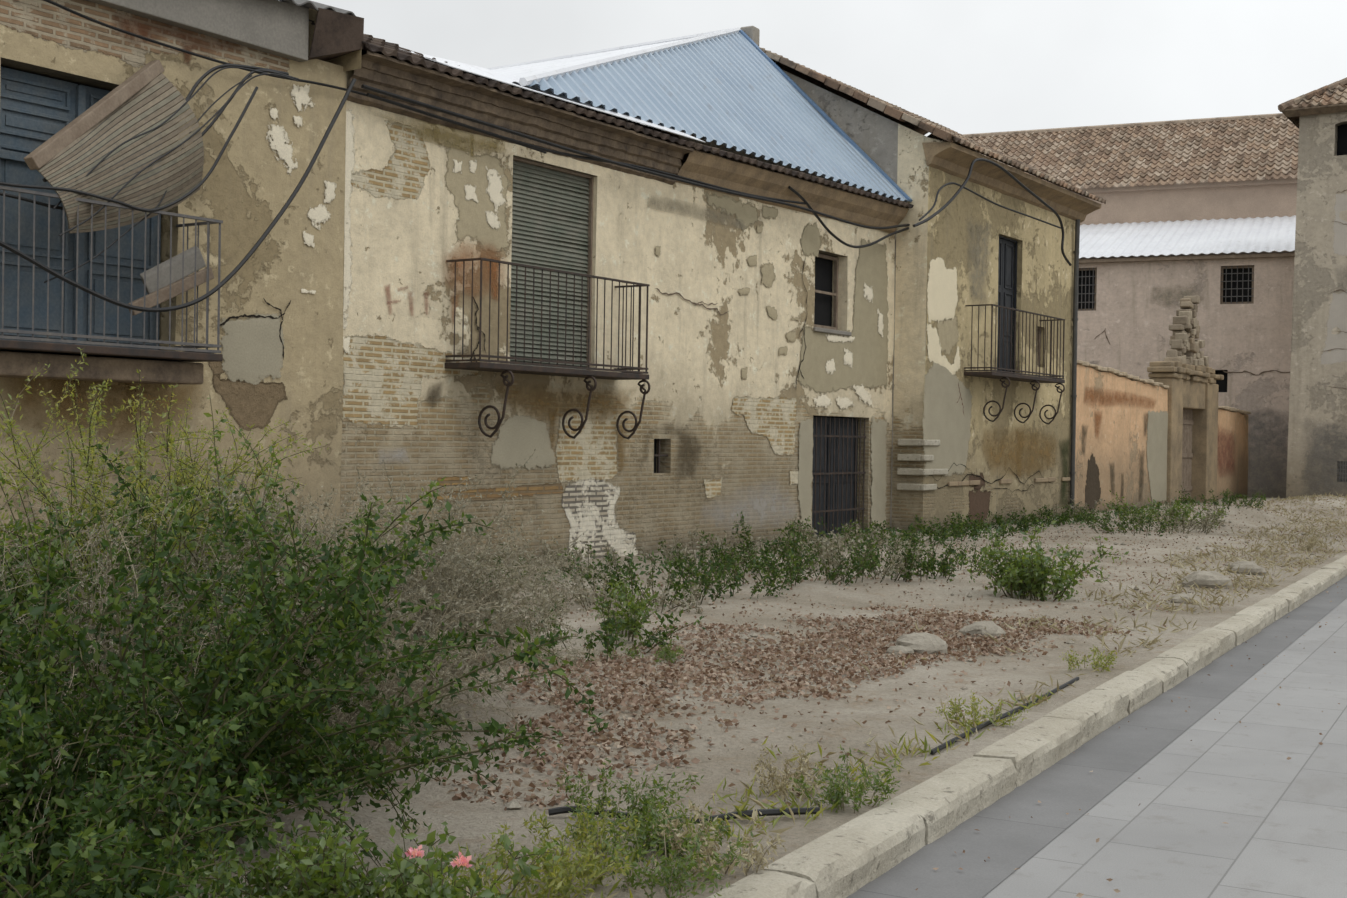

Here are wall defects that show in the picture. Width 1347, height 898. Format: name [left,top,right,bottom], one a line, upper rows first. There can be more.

flaking render [0,0,315,175]
peeling [303,180,337,248]
peeling [444,142,511,252]
crack [220,298,291,360]
crack [656,288,729,316]
peeling [926,324,961,375]
spalling [208,353,288,431]
peeling [609,527,638,556]